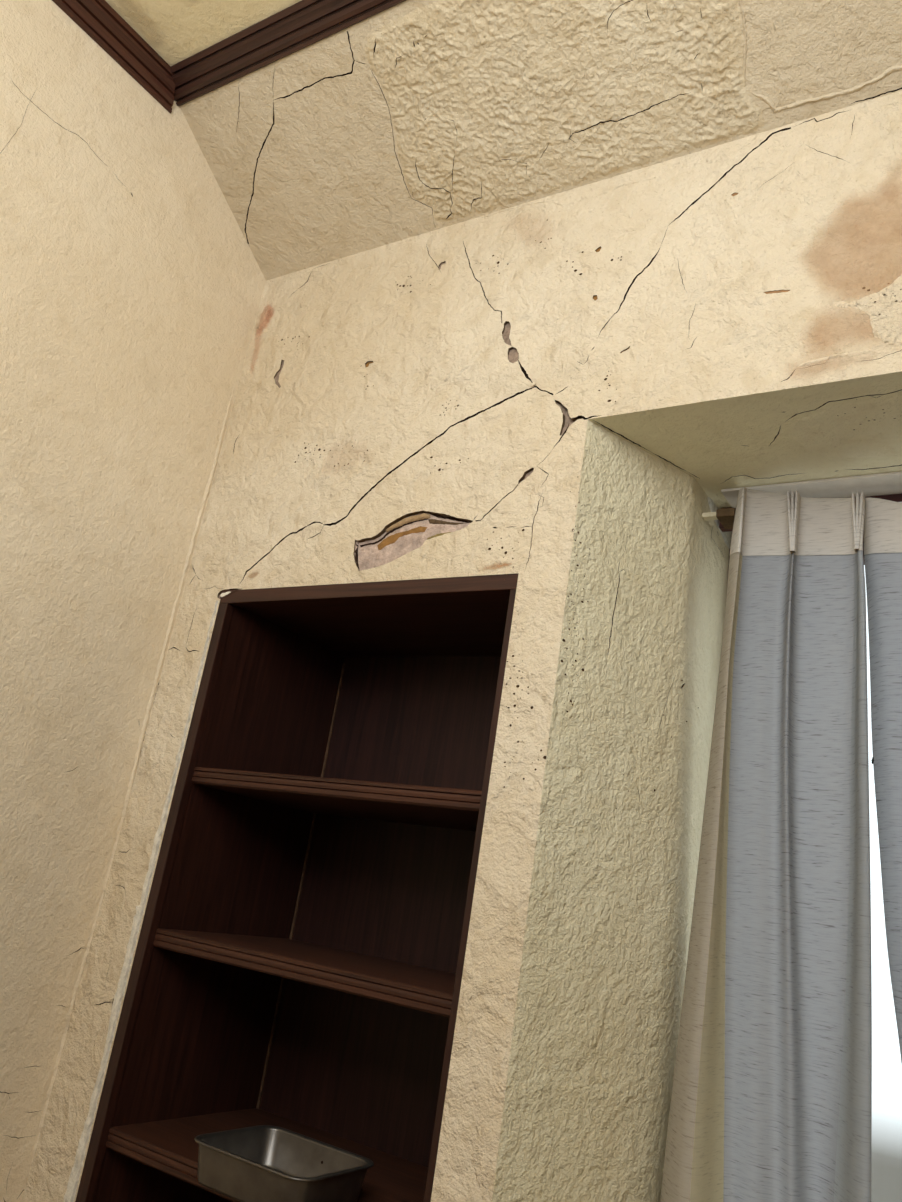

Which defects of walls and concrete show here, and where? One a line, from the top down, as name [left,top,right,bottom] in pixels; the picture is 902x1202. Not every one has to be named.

crack [236,0,702,272]
flaking render [353,511,473,571]
crack [143,88,902,741]